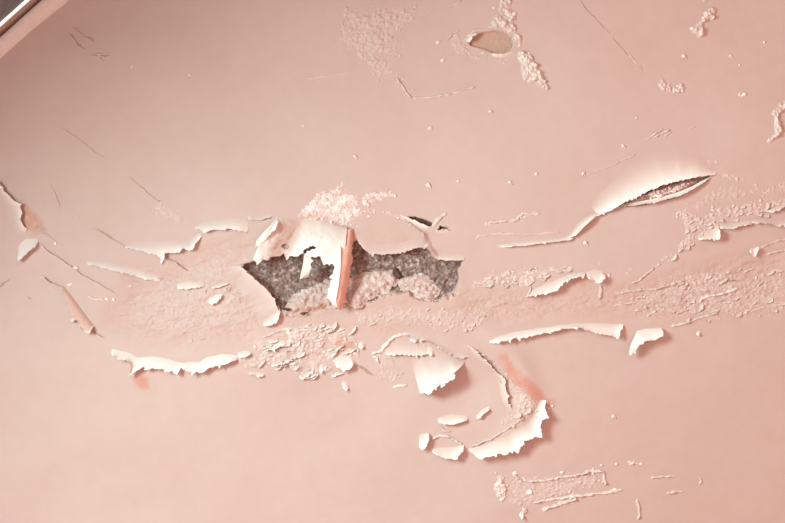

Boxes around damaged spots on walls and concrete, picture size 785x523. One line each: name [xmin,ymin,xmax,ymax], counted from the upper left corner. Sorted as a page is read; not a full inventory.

flaking render [450,0,549,91]
flaking render [0,185,560,460]
peeling [489,323,623,344]